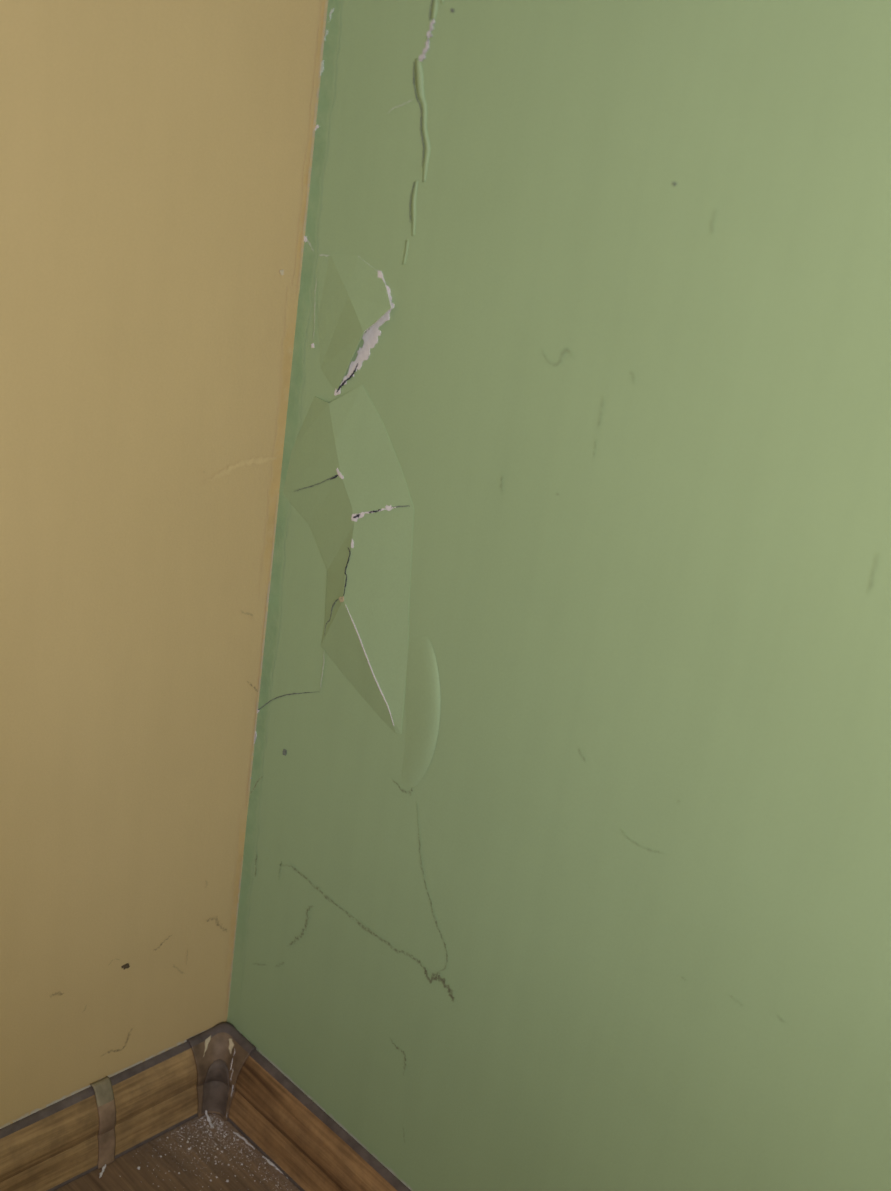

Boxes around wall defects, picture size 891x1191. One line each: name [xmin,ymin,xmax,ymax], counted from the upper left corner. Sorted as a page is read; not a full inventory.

flaking render [334,270,394,396]
crack [296,468,344,491]
crack [351,505,409,522]
crack [257,650,325,713]